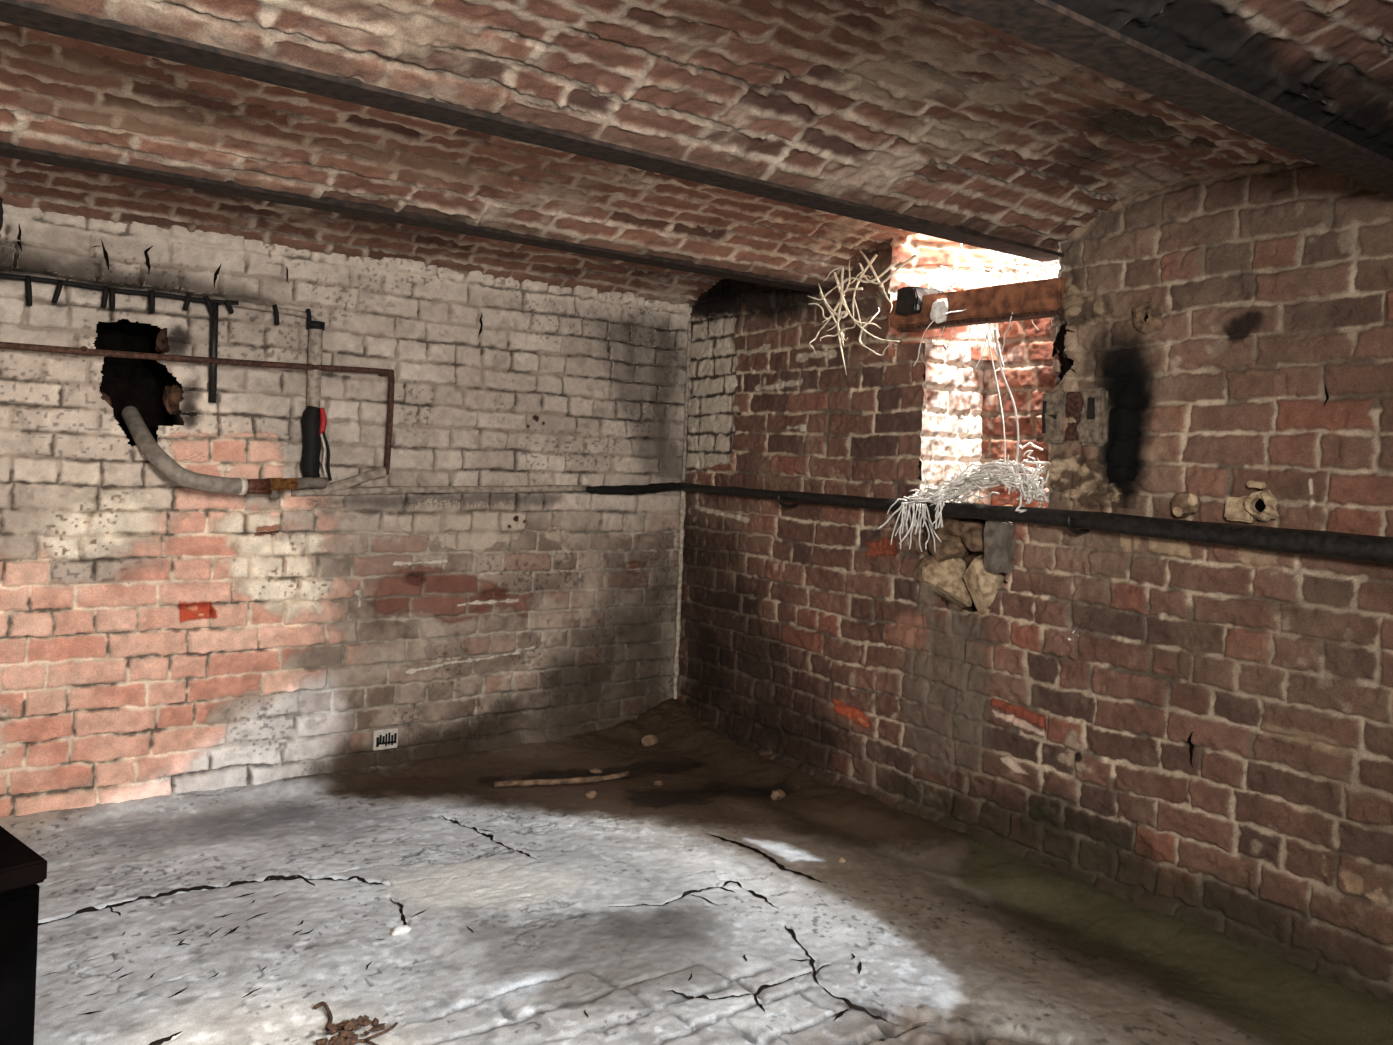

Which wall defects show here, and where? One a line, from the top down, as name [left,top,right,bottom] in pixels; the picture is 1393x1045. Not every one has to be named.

leakage [1095,336,1147,508]
peeling [398,499,526,554]
peeling [0,319,360,817]
peeling [374,563,531,623]
crack [38,875,407,925]
peeling [1322,855,1390,906]
crack [609,833,904,1028]
crack [148,1031,183,1045]